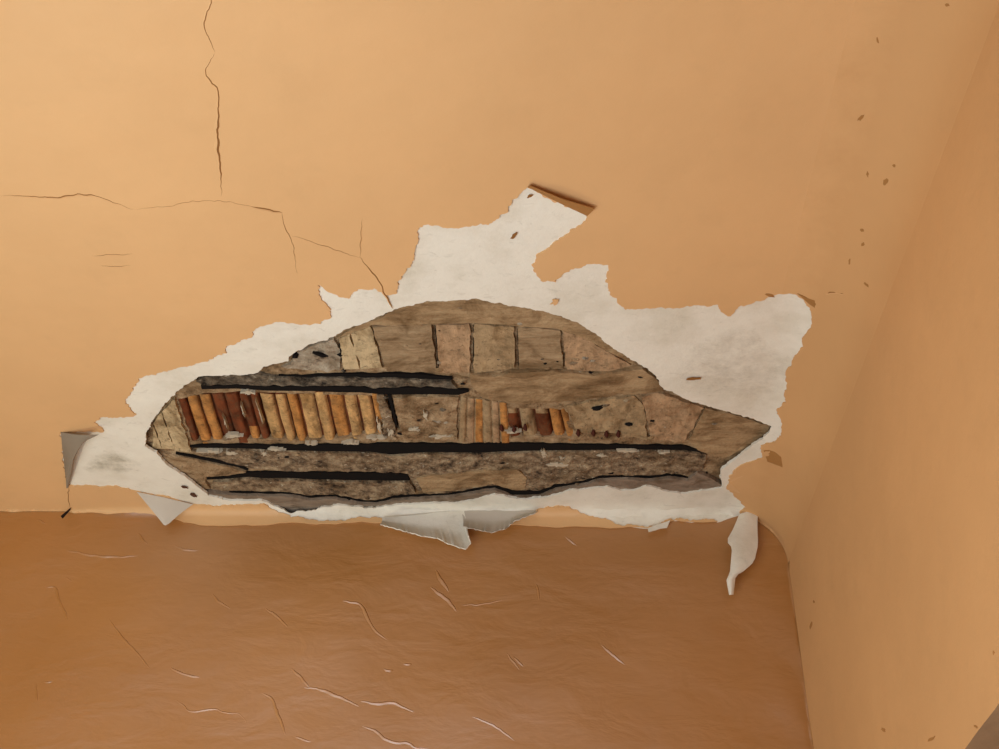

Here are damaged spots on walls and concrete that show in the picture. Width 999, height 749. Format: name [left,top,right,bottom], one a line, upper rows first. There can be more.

crack [6,0,393,309]
spalling [61,185,816,550]